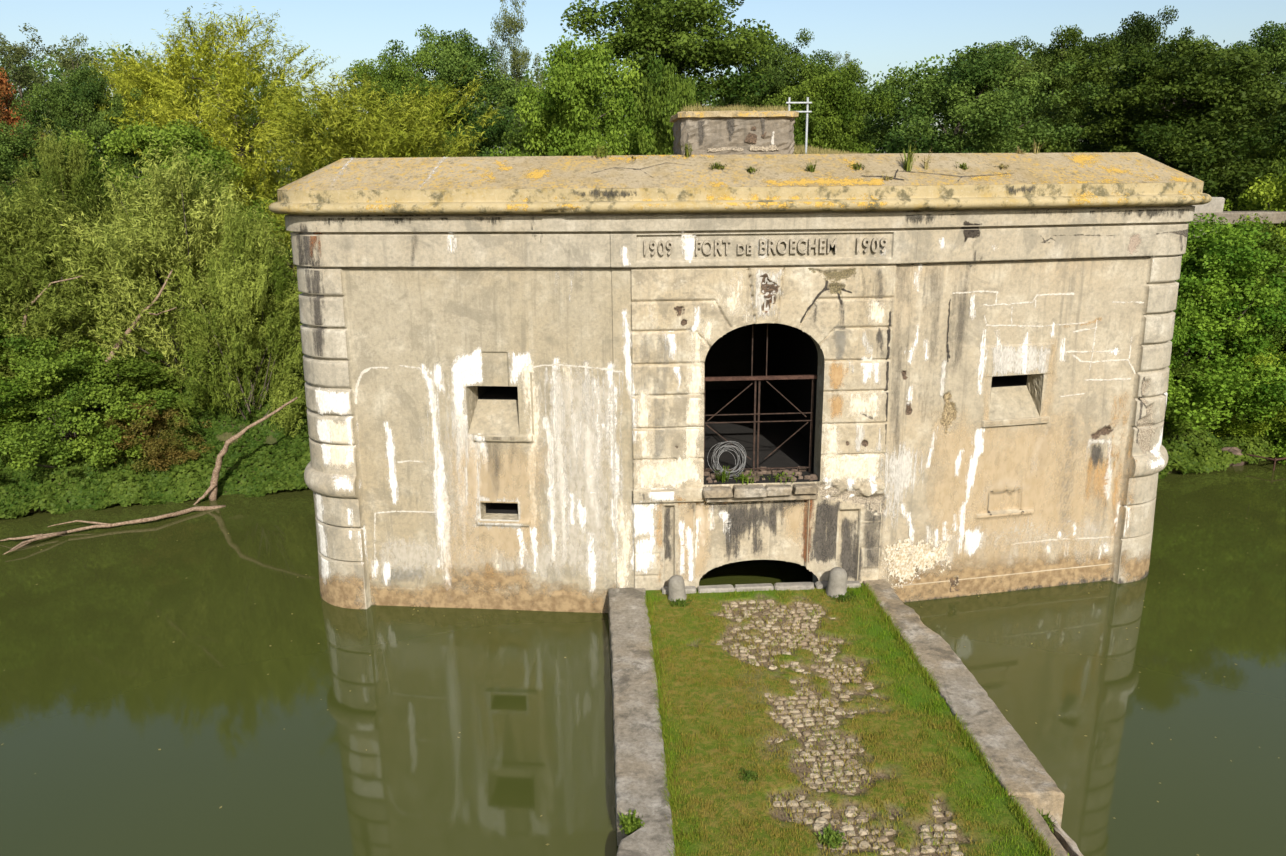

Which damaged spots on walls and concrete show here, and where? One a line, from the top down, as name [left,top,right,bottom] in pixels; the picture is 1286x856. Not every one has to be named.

leakage [665,238,782,460]
spalling [760,274,780,311]
crack [800,281,852,323]
leakage [315,387,361,491]
leakage [384,422,398,504]
leakage [422,310,650,593]
spalling [940,392,958,434]
leakage [810,273,1130,580]
spalling [1091,425,1113,440]
leakage [316,493,331,596]
leakage [643,486,800,582]
peeling [818,440,960,592]